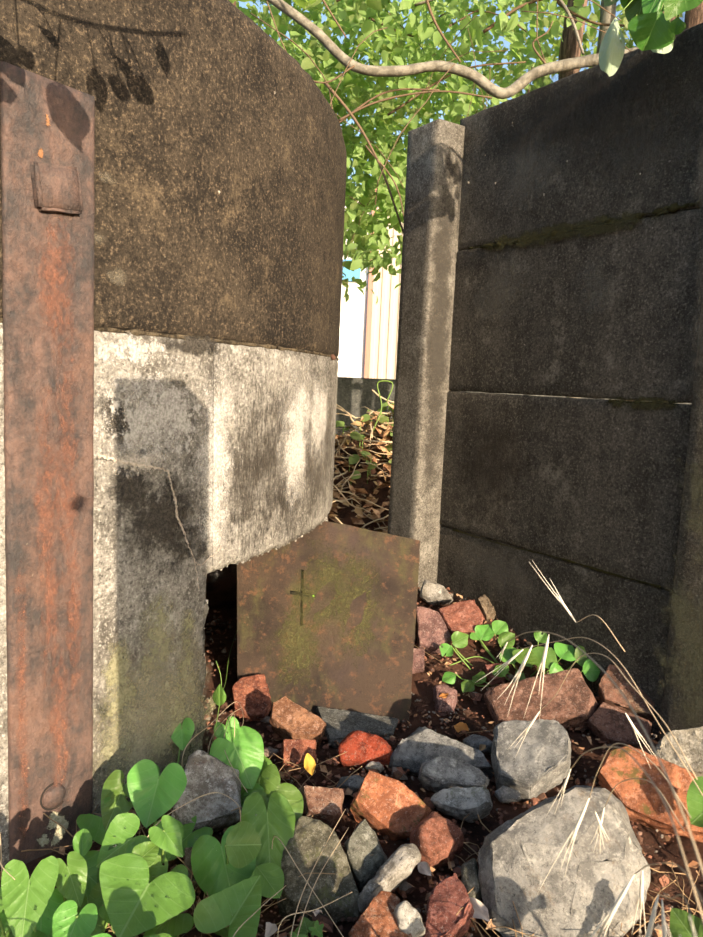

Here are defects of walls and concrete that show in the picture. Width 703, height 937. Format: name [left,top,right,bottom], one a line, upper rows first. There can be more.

crack [98,449,221,589]
leakage [93,332,333,576]